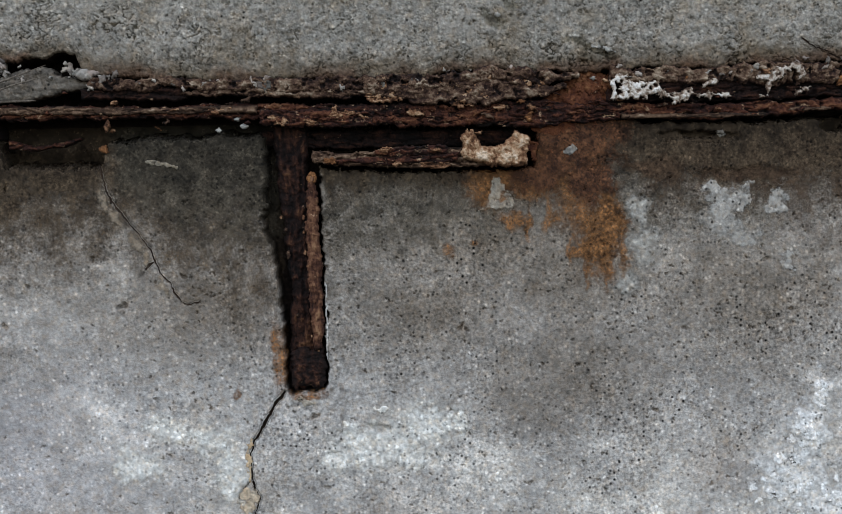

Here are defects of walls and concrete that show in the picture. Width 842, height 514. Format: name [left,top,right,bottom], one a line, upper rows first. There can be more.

water stain [610,73,731,105]
water stain [756,61,812,98]
crack [98,166,200,306]
corrosion [0,60,842,400]
crack [237,391,286,514]